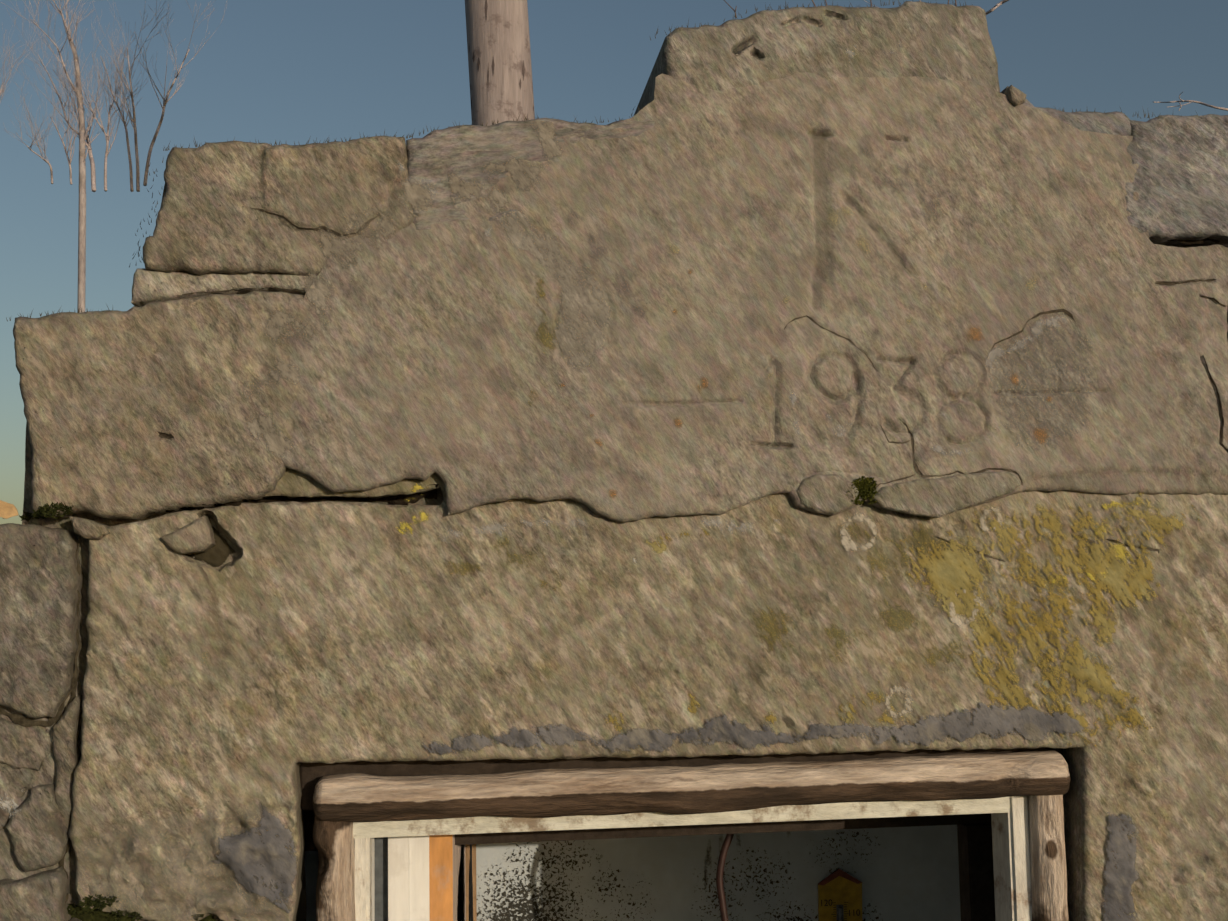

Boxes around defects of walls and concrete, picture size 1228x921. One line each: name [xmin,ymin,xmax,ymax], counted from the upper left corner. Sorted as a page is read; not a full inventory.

crack [251,208,381,237]
crack [1167,237,1220,245]
crack [784,315,877,371]
crack [991,309,1076,350]
crack [1157,279,1228,334]
crack [1204,358,1228,452]
crack [874,422,1022,490]
spalling [160,514,235,567]
water stain [477,840,655,921]
water stain [691,838,818,921]